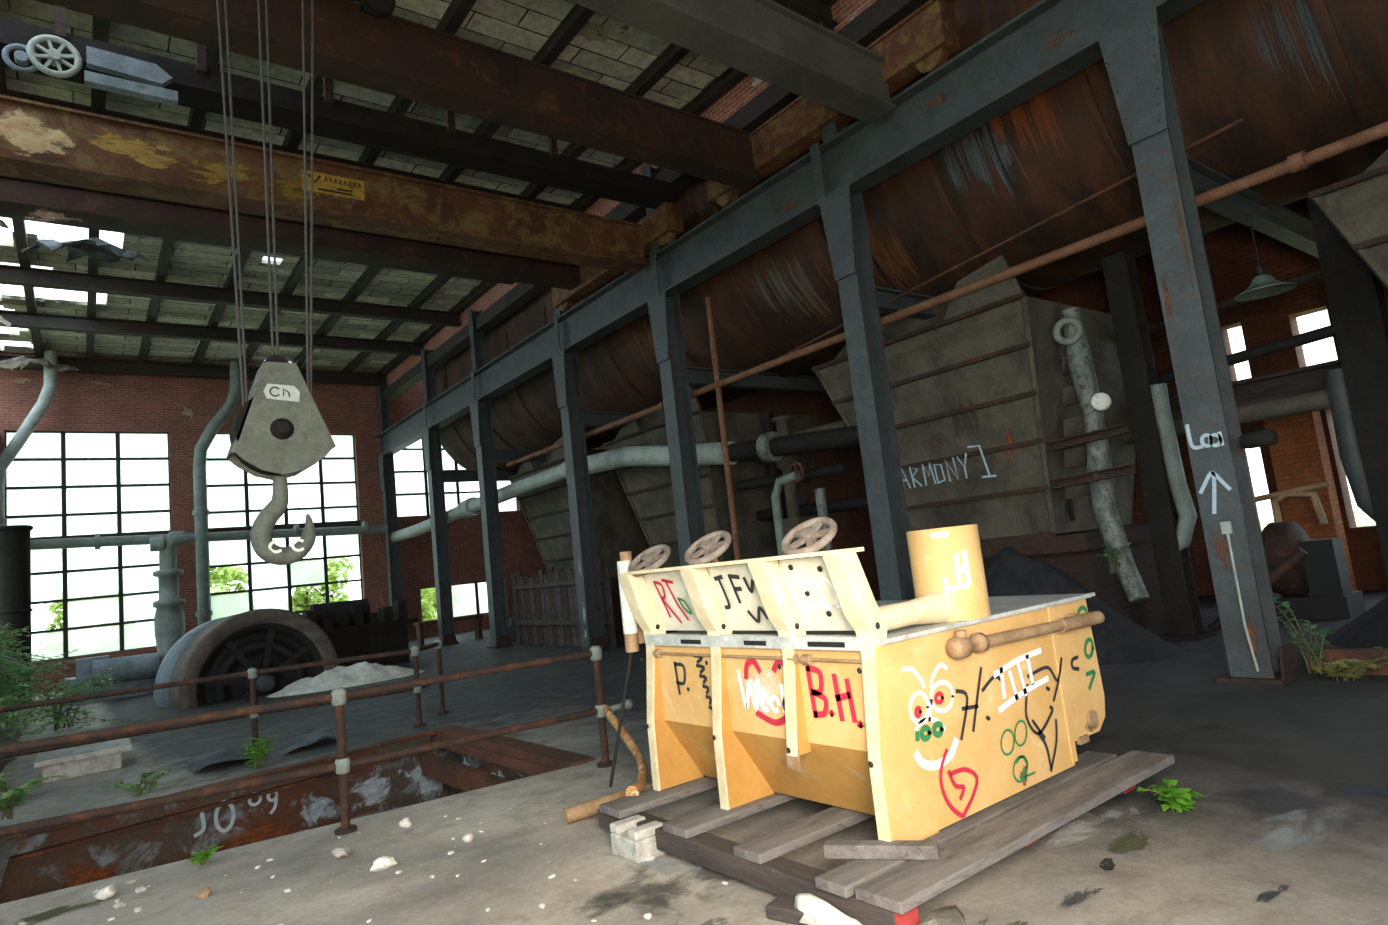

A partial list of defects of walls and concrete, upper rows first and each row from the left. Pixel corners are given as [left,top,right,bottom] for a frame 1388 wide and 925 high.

rust [1251,0,1346,101]
peeling [0,108,323,202]
rust [941,91,1063,196]
rust [64,865,114,889]
rust [223,822,295,850]